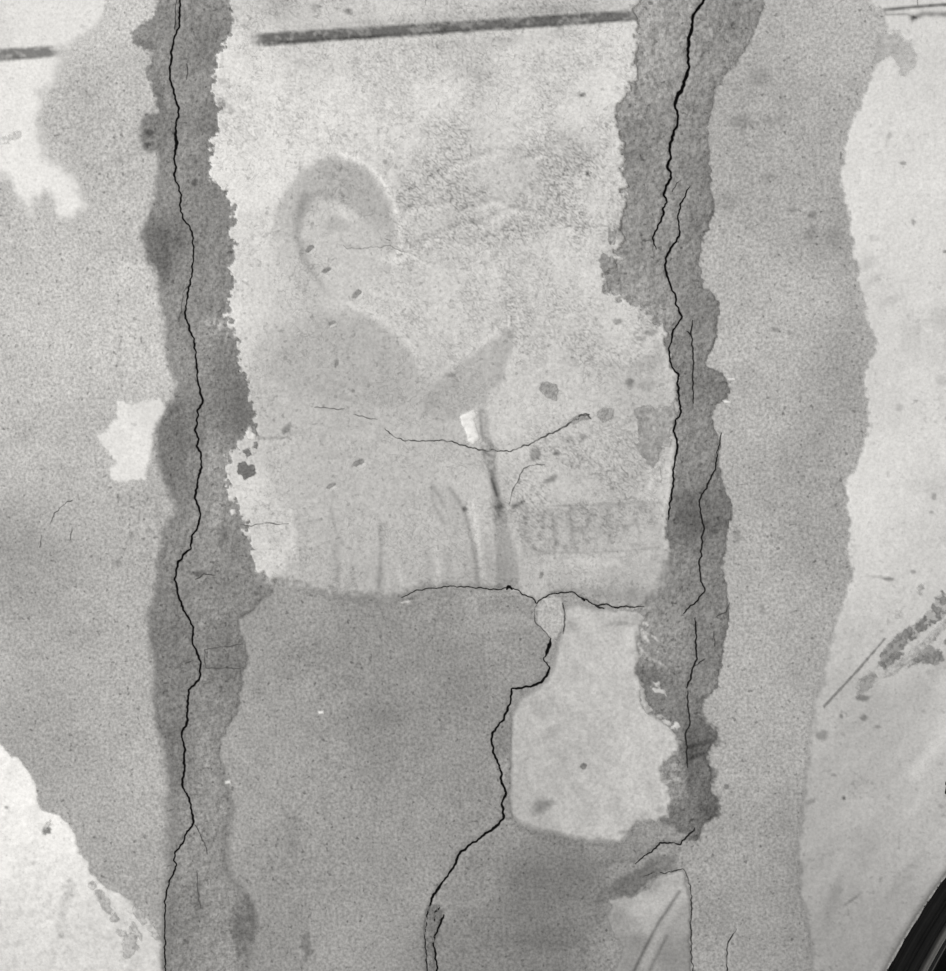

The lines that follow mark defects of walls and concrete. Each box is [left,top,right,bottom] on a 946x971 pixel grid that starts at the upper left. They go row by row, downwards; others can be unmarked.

flaking render [599,231,621,292]
crack [652,0,705,520]
crack [164,0,241,971]
flaking render [237,423,258,480]
crack [314,407,590,495]
flaking render [639,681,680,729]
crack [683,435,728,768]
peeling [824,590,946,707]
crack [401,585,644,971]
crack [635,827,695,971]